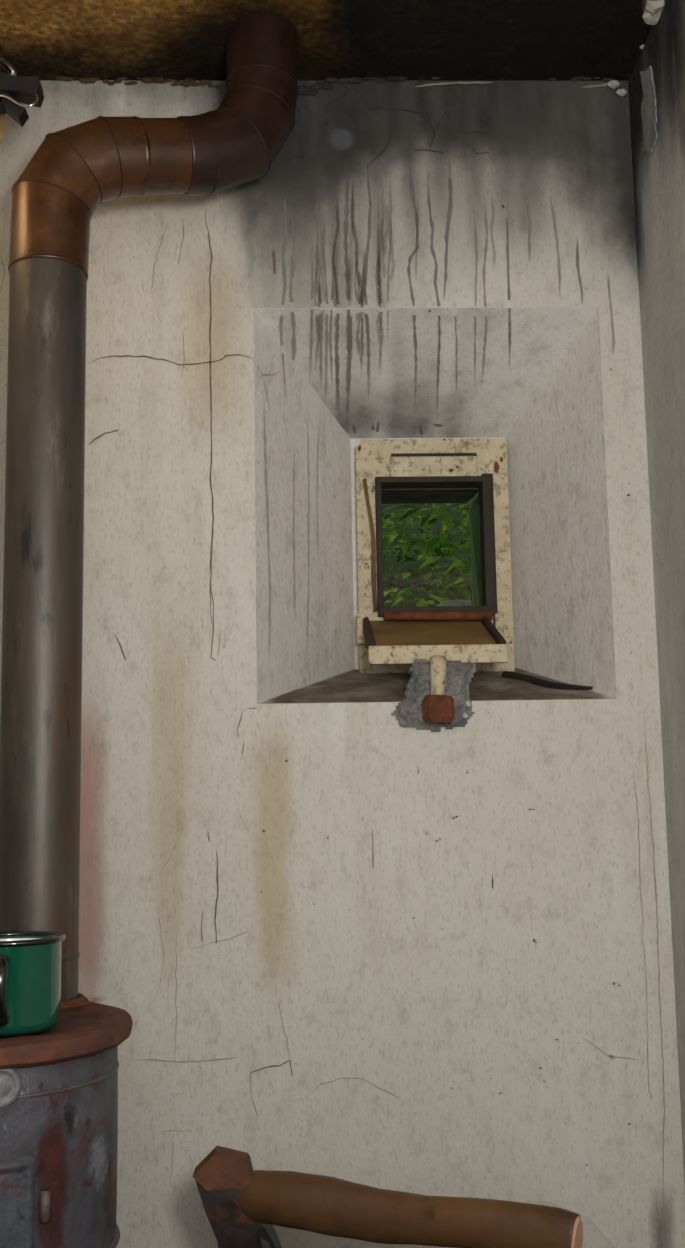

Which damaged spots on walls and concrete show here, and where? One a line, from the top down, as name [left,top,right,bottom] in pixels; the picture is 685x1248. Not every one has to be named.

damp [272,182,392,390]
damp [407,175,458,387]
damp [474,216,487,365]
damp [552,212,561,287]
crack [92,211,280,661]